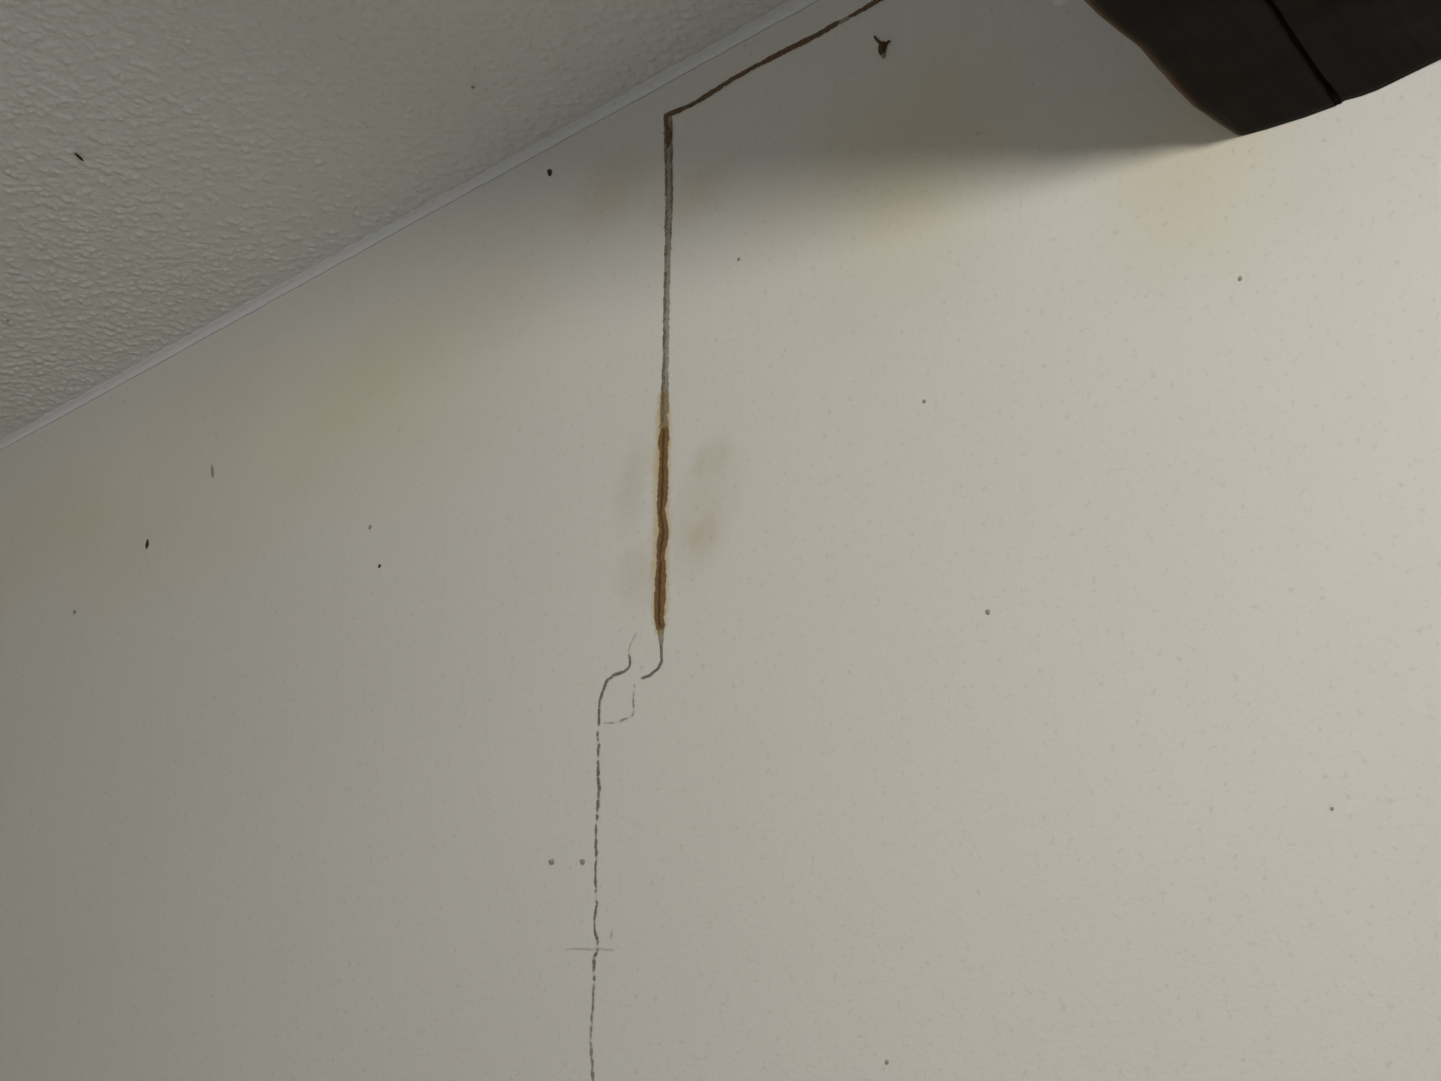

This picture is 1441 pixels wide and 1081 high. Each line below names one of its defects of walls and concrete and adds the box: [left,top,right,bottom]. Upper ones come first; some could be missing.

crack [660,0,882,429]
rust [654,427,669,629]
crack [590,627,664,1079]